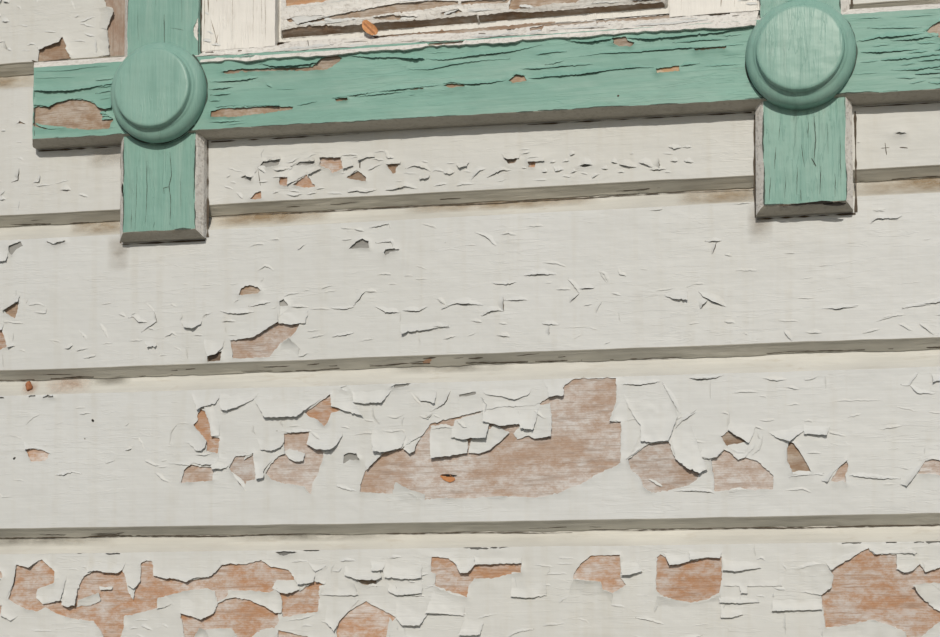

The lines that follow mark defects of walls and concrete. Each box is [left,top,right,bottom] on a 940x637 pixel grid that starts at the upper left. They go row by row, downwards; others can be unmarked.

peeling [277,0,730,45]
peeling [36,37,71,61]
peeling [223,47,425,74]
peeling [17,80,113,130]
peeling [241,153,375,188]
peeling [204,299,308,361]
peeling [168,383,437,494]
peeling [343,377,773,508]
peeling [768,424,830,472]
peeling [0,547,547,637]
peeling [568,555,642,603]
peeling [656,541,940,637]